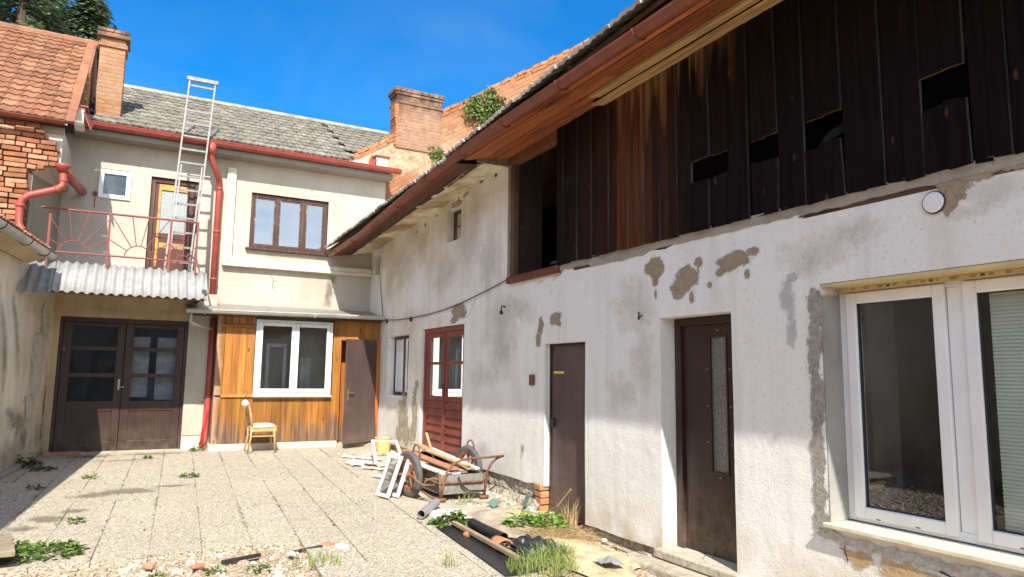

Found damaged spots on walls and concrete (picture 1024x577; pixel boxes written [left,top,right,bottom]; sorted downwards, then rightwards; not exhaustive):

spalling [935,163,1024,217]
peeling [644,264,658,299]
spalling [787,287,1017,577]